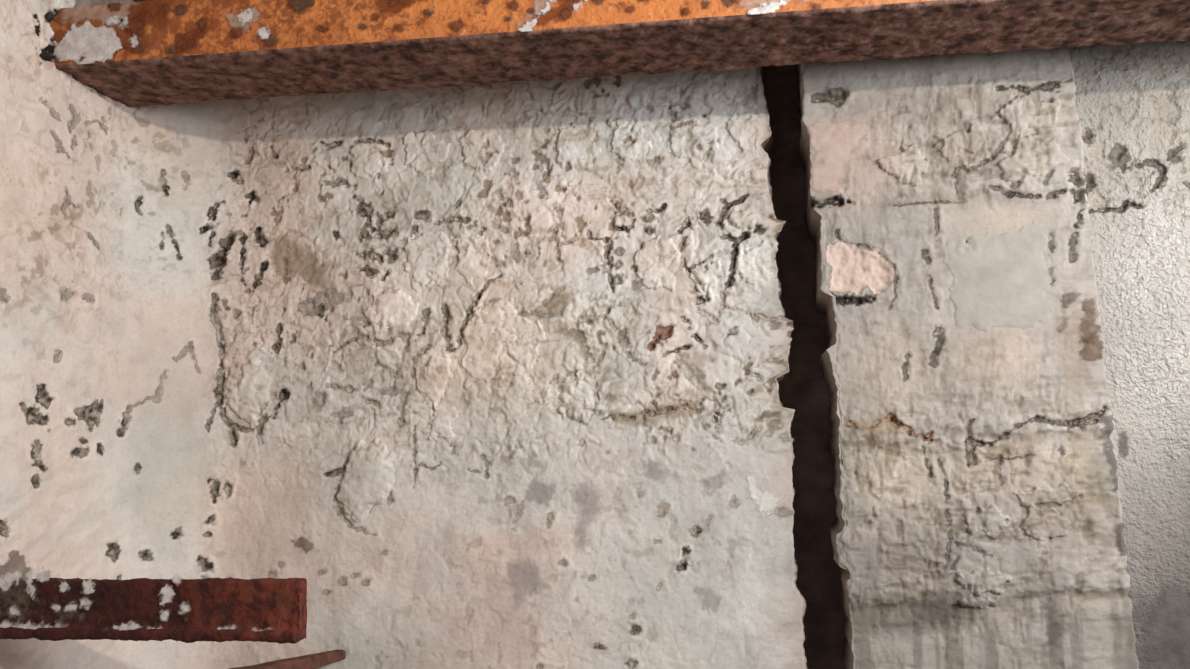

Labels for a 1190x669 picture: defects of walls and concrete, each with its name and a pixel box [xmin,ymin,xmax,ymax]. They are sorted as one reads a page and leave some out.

rust [107,0,187,54]
rust [166,18,209,57]
rust [358,0,434,32]
rust [506,0,604,24]
flaking render [350,129,505,179]
crack [127,138,390,448]
flaking render [353,195,493,335]
crack [324,165,794,536]
flaking render [825,242,898,297]
crack [895,139,1067,381]
crack [1048,142,1190,332]
crack [846,405,1111,569]